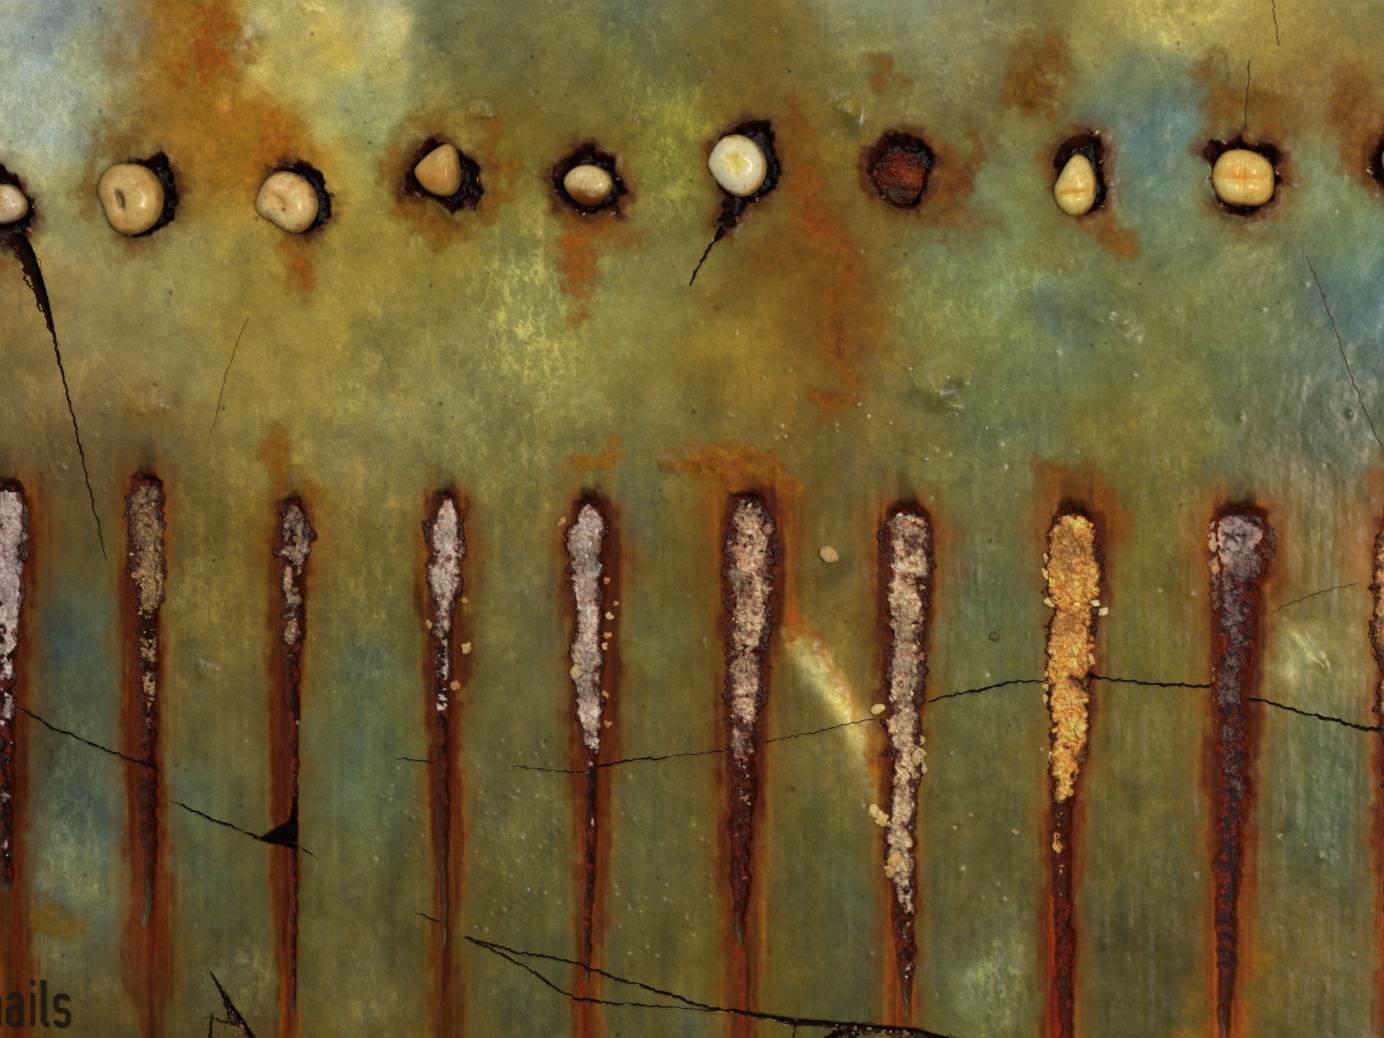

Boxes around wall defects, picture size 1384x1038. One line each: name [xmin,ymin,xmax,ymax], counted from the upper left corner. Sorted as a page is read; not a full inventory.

crack [8,231,107,559]
rust [0,475,42,1038]
crack [15,707,317,858]
crack [202,971,254,1038]
rust [554,436,633,1038]
crack [417,913,957,1038]
rust [670,442,819,1038]
rust [864,492,945,1038]
rust [1032,461,1132,1038]
crack [1088,673,1213,688]
rust [1197,492,1288,1038]
crack [1246,698,1384,735]